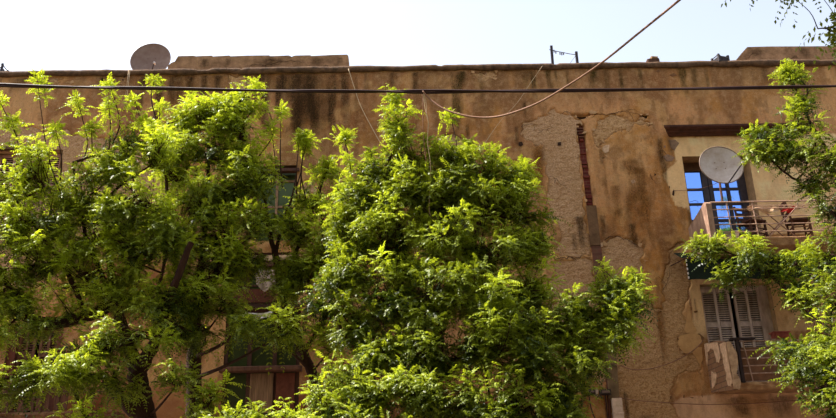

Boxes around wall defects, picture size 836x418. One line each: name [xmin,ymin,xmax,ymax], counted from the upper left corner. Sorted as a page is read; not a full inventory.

leakage [261,75,347,132]
spalling [0,115,173,214]
spalling [0,211,103,288]
spalling [518,109,653,322]
spalling [601,236,705,418]